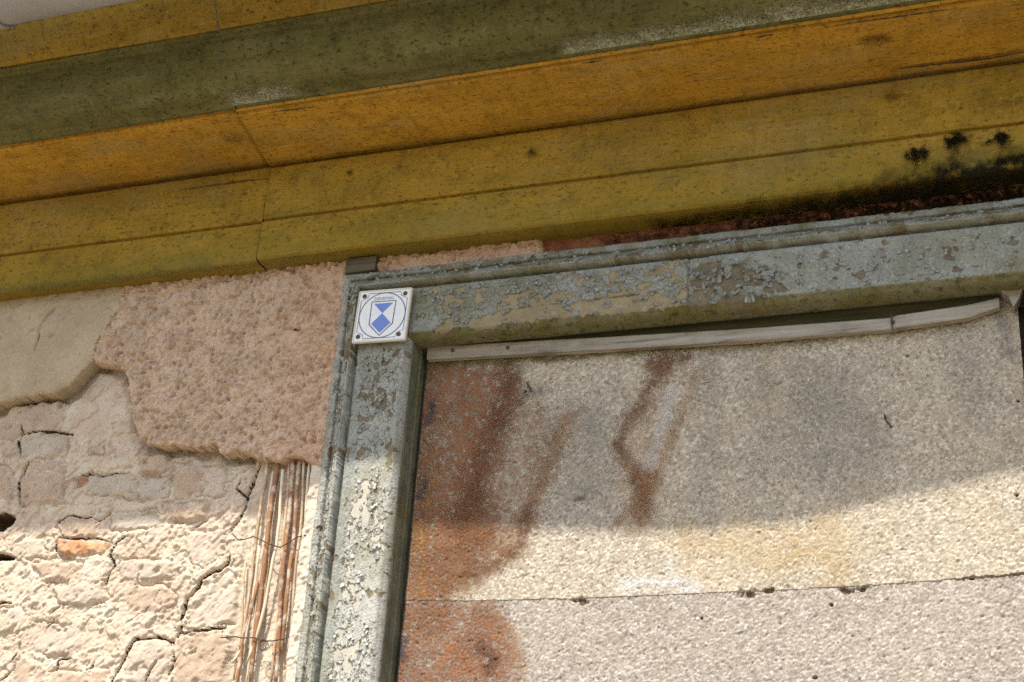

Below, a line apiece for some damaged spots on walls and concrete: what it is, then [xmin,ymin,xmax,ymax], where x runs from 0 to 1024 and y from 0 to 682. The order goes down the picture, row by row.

damp [613,130,1024,244]
crack [17,428,74,504]
crack [55,514,126,585]
crack [235,466,261,519]
rust [397,361,547,682]
flaking render [0,229,978,682]
rust [613,354,690,522]
crack [57,556,231,682]